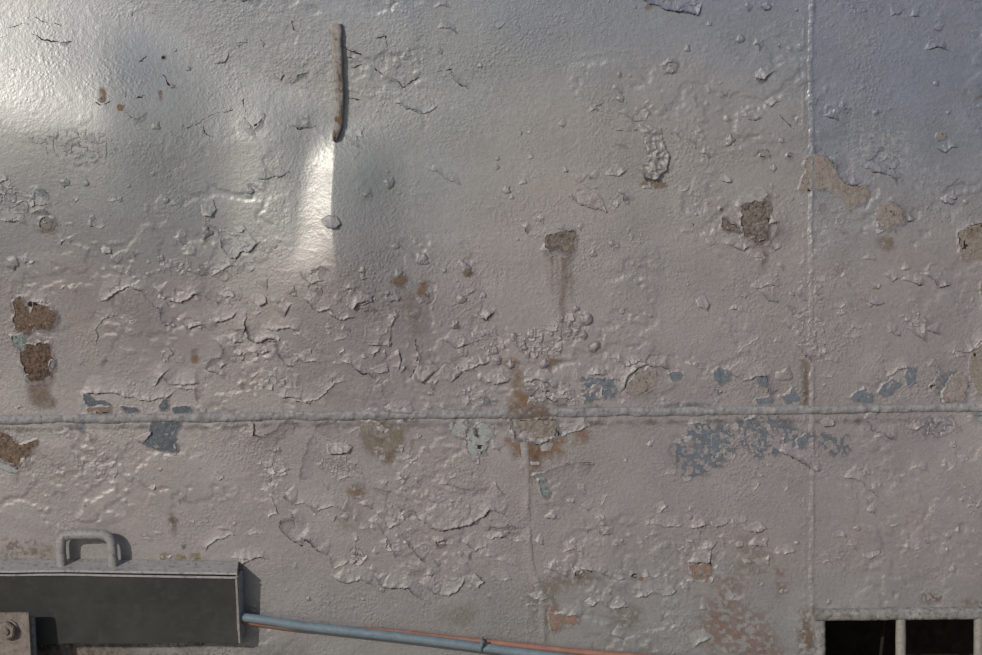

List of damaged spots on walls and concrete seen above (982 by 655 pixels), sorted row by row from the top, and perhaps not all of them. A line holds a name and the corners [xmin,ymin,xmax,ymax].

peeling [633,0,712,26]
peeling [28,128,118,167]
peeling [631,98,673,194]
spalling [785,101,917,249]
spalling [7,282,79,387]
spalling [717,186,982,517]
spalling [0,430,40,474]
peeling [52,198,849,622]
rust [509,440,563,468]
peeling [659,611,714,650]